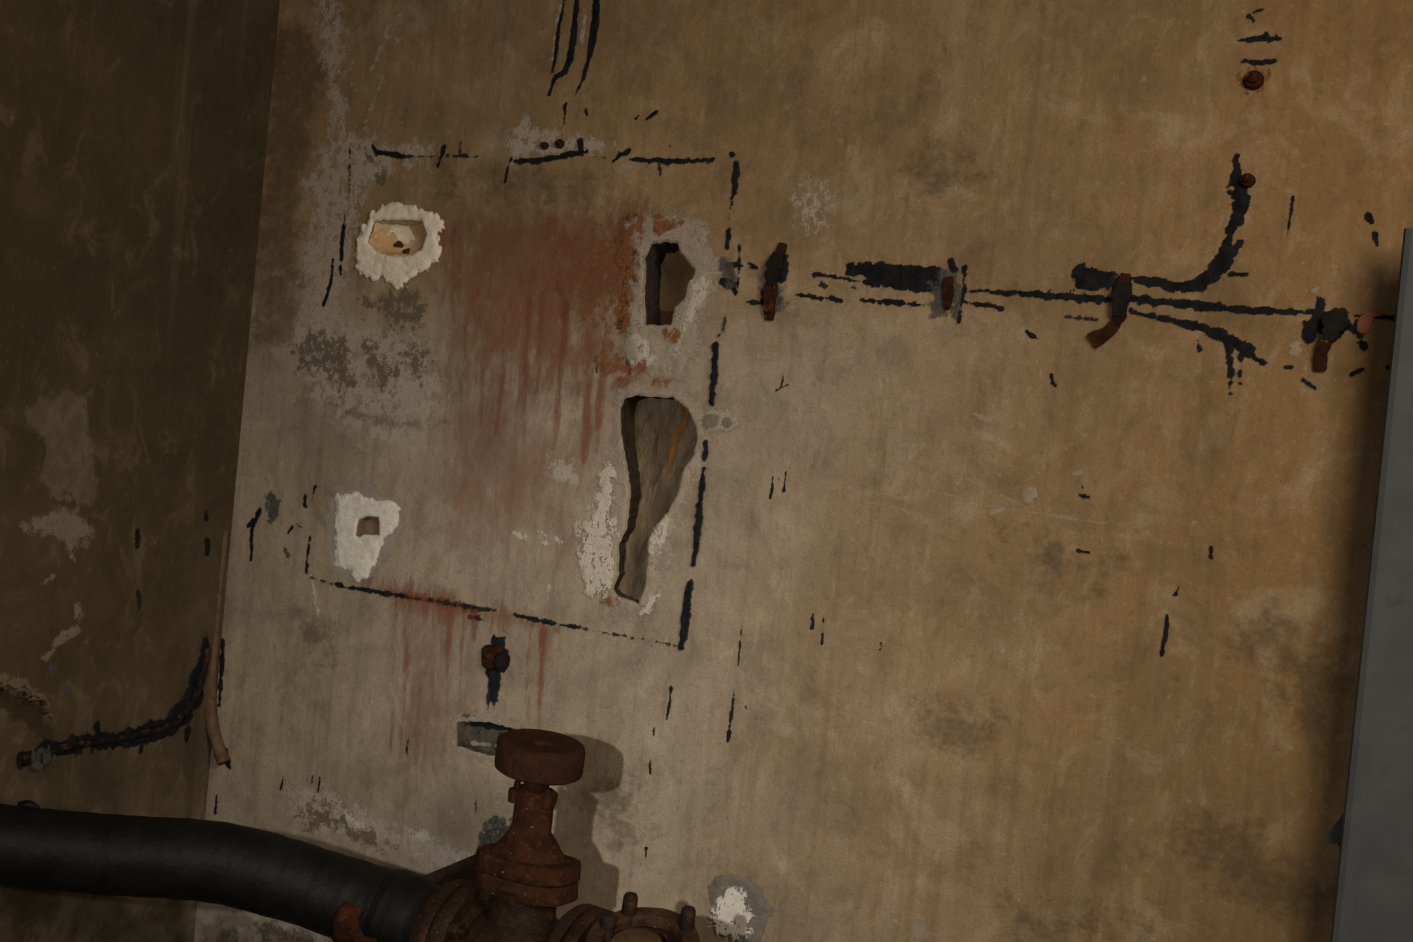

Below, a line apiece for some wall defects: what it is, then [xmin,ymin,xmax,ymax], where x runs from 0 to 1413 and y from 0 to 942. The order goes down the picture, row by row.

crack [309,575,320,616]
spalling [572,207,726,627]